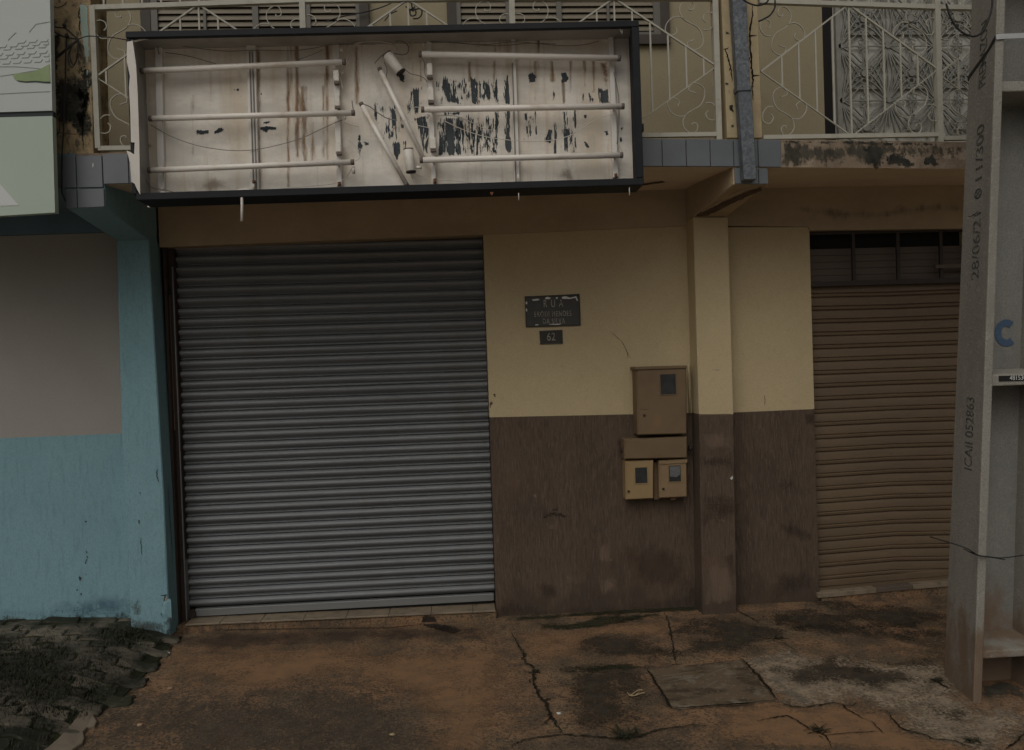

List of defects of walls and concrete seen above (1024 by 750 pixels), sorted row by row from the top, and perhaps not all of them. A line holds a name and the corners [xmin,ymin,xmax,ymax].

leakage [54,22,92,136]
leakage [783,140,960,170]
crack [664,613,678,665]